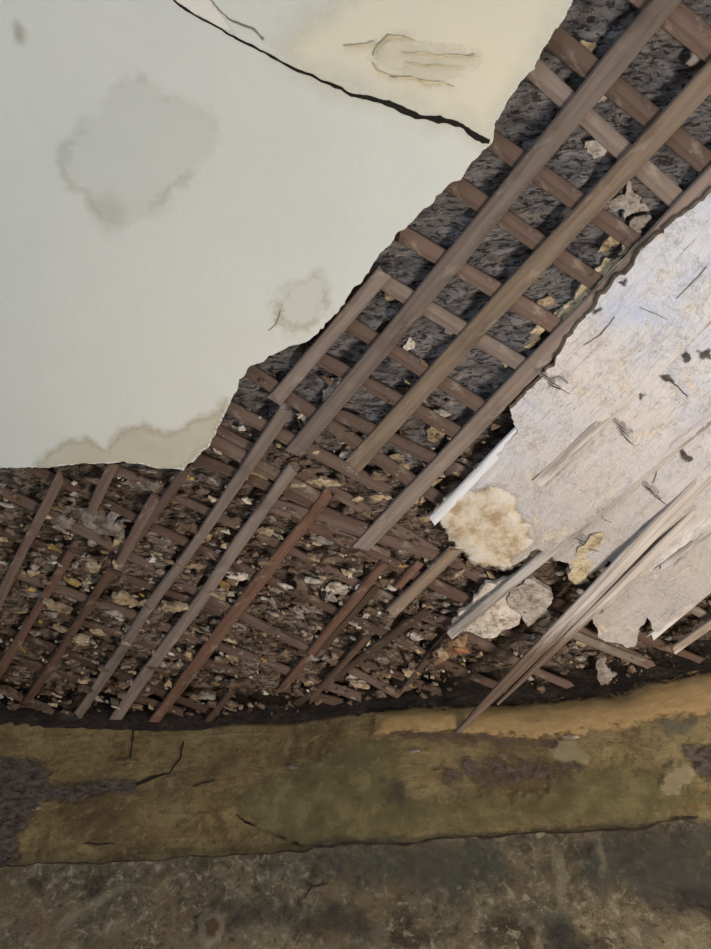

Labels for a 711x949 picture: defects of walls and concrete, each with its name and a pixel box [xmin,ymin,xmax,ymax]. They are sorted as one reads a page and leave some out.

spalling [176,0,234,33]
spalling [560,0,641,60]
crack [173,0,490,144]
spalling [539,47,584,92]
spalling [620,27,706,111]
spalling [494,77,561,152]
spalling [592,95,646,144]
spalling [463,149,513,197]
spalling [545,125,618,195]
spalling [649,144,700,191]
peeling [0,176,711,867]
crack [0,815,698,868]